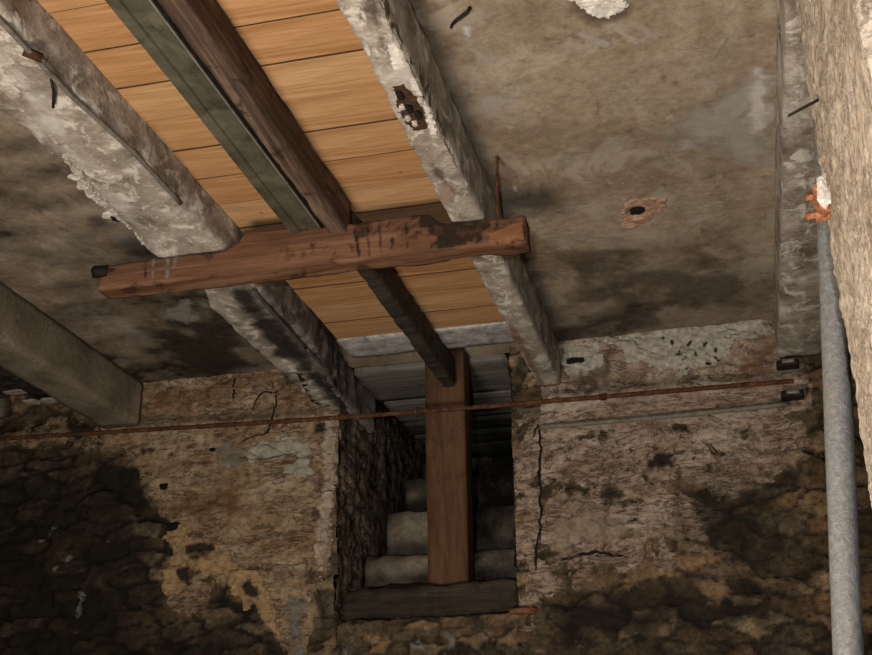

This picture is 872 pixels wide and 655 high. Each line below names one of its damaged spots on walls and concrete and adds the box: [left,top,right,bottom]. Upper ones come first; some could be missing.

spalling [568,0,629,21]
spalling [387,33,438,138]
water stain [648,453,673,467]
crack [533,424,627,572]
water stain [601,486,620,506]